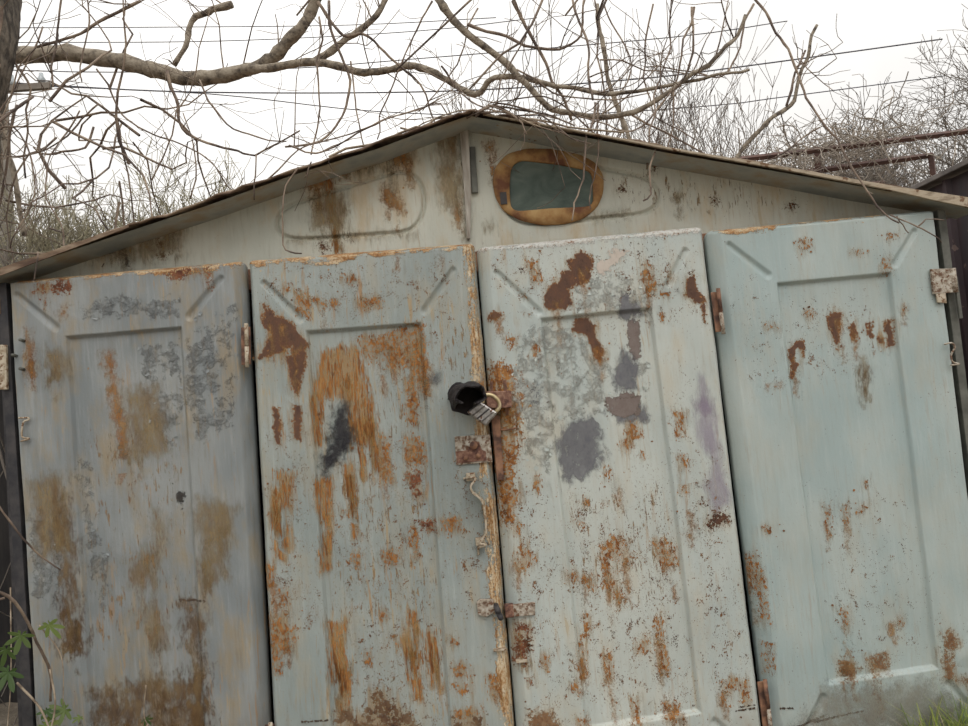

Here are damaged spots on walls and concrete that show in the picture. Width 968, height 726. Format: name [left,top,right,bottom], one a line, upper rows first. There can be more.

corrosion [612,166,748,213]
corrosion [715,222,805,242]
peeling [84,295,180,320]
peeling [138,304,239,444]
peeling [511,249,650,472]
corrosion [17,226,752,726]
corrosion [745,550,773,627]
corrosion [822,478,919,707]